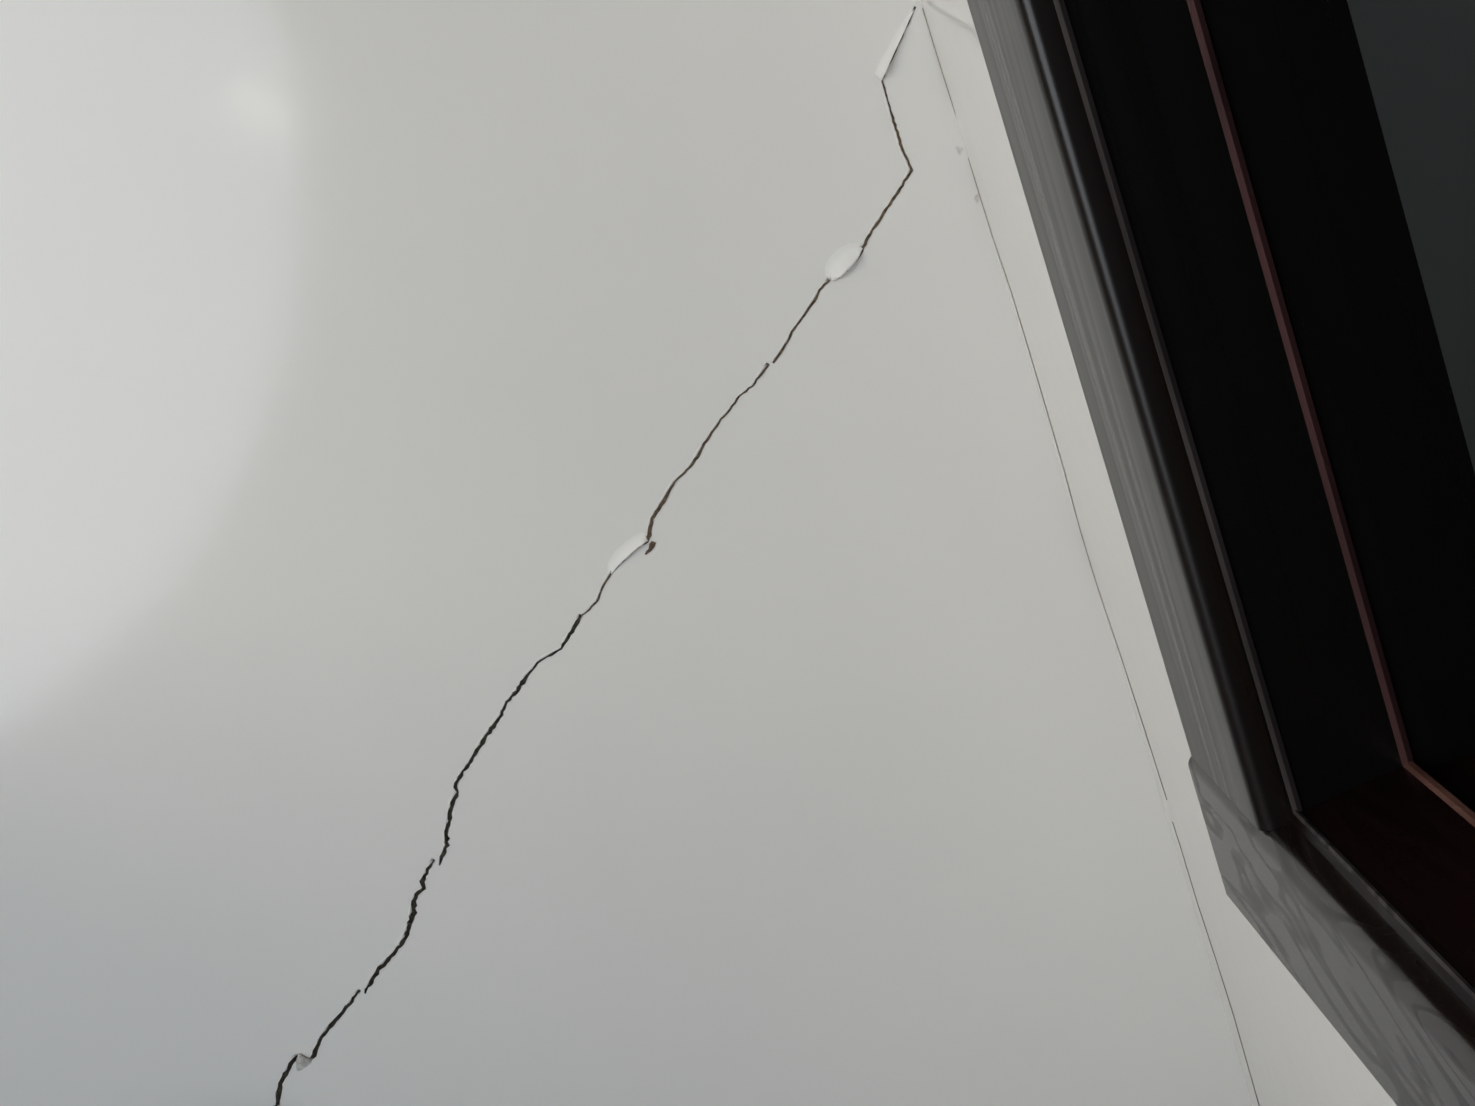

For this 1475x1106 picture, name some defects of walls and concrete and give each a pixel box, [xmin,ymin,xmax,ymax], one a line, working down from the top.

peeling [874,6,916,81]
peeling [825,243,863,281]
crack [274,6,956,1105]
peeling [607,532,648,576]
crack [968,158,1259,1106]